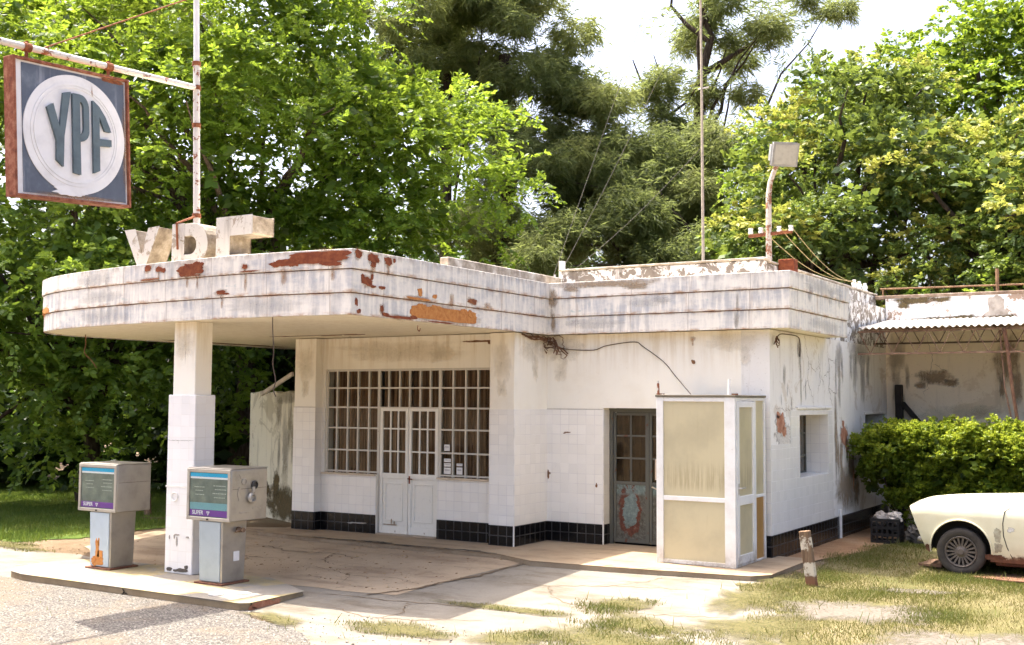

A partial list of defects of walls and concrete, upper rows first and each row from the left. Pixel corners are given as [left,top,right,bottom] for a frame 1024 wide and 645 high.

corrosion [240,249,396,290]
spalling [774,411,791,444]
leakage [835,403,859,506]
leakage [267,472,279,497]